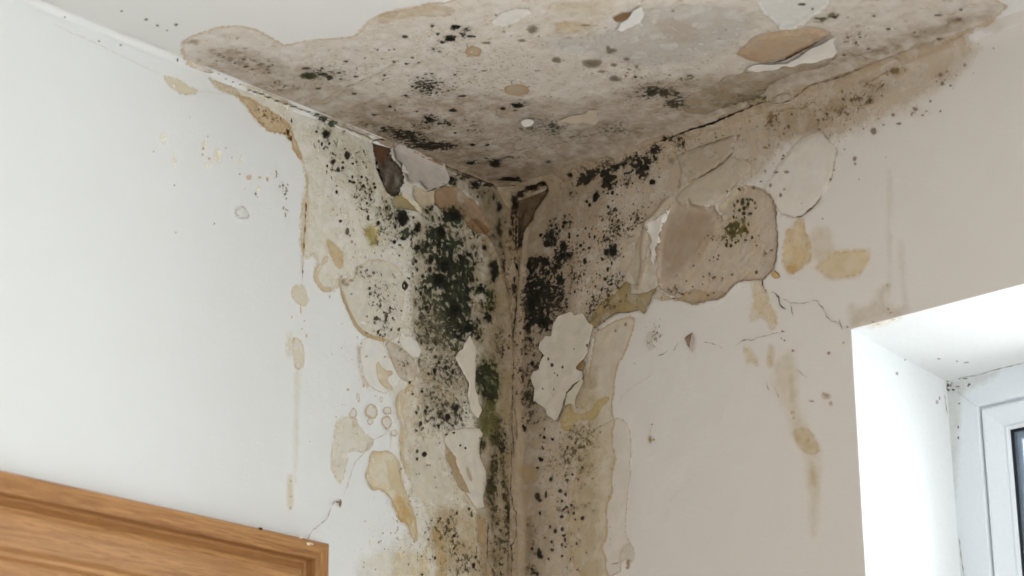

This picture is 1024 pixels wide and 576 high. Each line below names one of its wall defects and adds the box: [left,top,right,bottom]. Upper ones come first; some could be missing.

crack [652,40,935,145]
water stain [711,0,1007,165]
flaking render [372,138,491,234]
water stain [707,181,758,248]
water stain [177,18,735,576]
flaking render [530,185,778,420]
crack [705,259,848,348]
peeling [416,336,487,510]
crack [308,430,389,539]